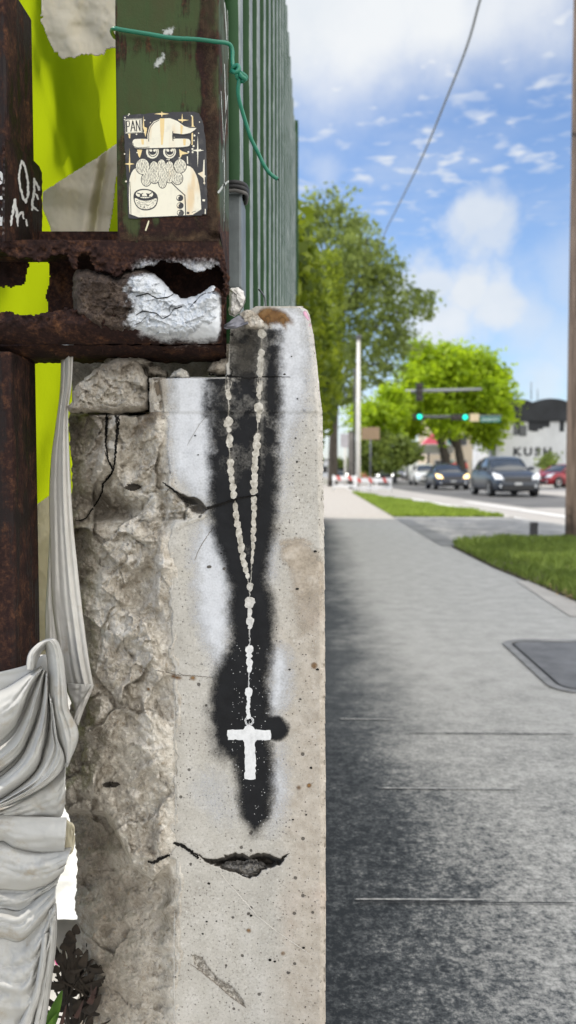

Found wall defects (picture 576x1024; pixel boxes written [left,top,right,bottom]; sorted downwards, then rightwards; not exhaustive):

corrosion [121,0,219,241]
corrosion [117,142,125,217]
corrosion [257,308,290,327]
crack [76,377,150,521]
crack [162,482,259,561]
spalling [64,412,246,1024]
crack [148,842,290,879]